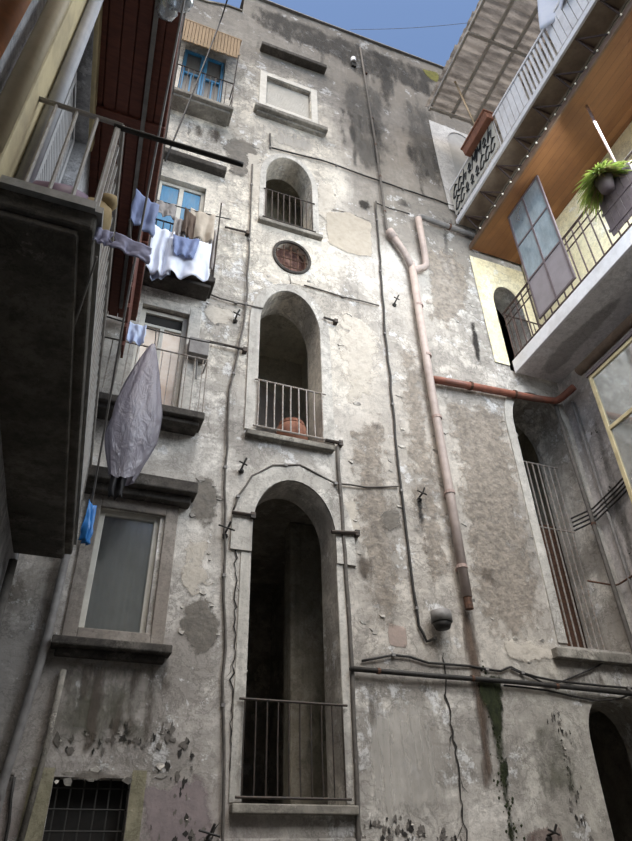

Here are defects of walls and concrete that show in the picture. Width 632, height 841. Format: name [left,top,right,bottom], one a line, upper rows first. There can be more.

damp [261,10,432,167]
damp [407,103,439,180]
corrosion [463,611,492,784]
flaking render [53,731,75,755]
peeling [54,766,133,786]
peeling [84,718,211,841]
flaking render [547,711,594,841]
flaking render [361,815,426,841]
flaking render [437,827,462,841]